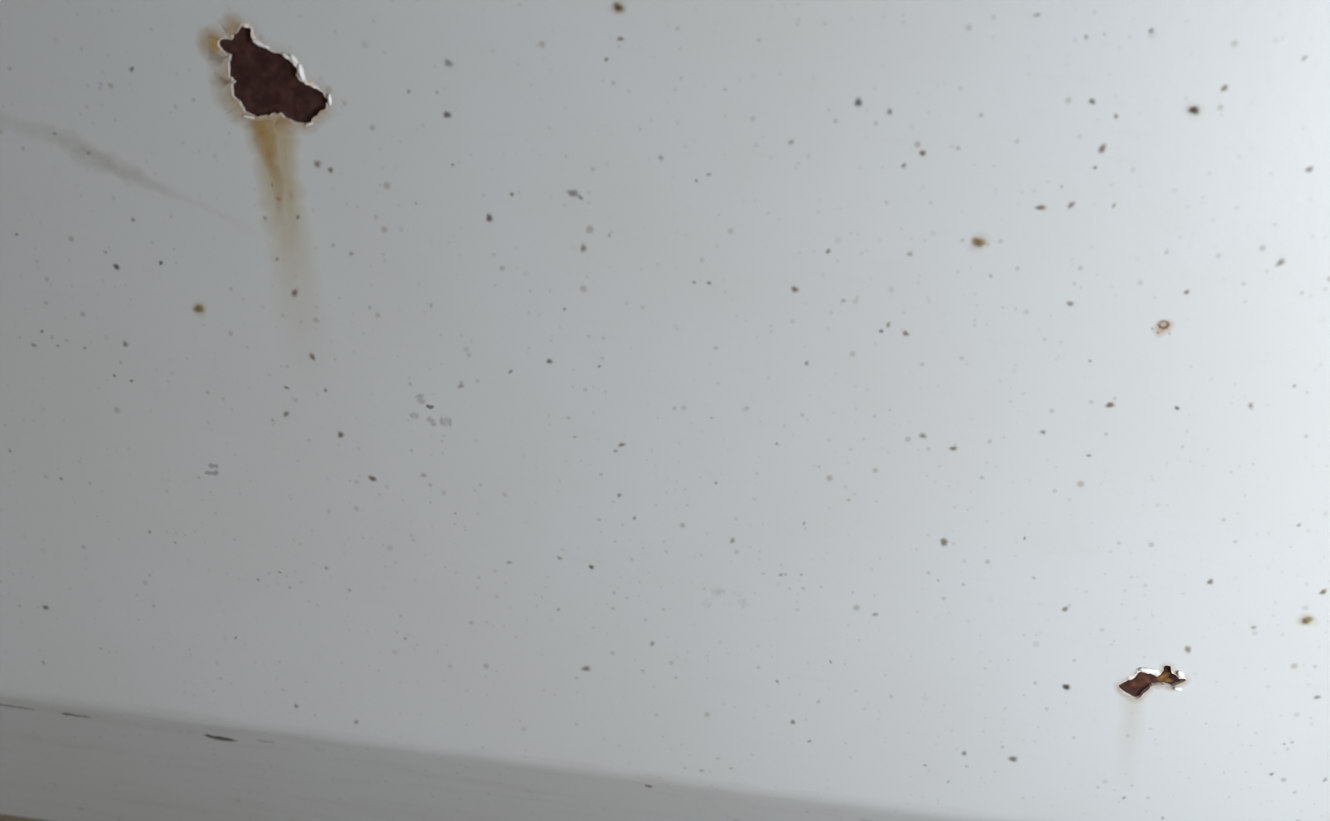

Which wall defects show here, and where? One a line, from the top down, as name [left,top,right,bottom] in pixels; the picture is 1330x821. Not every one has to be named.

corrosion [208,23,332,139]